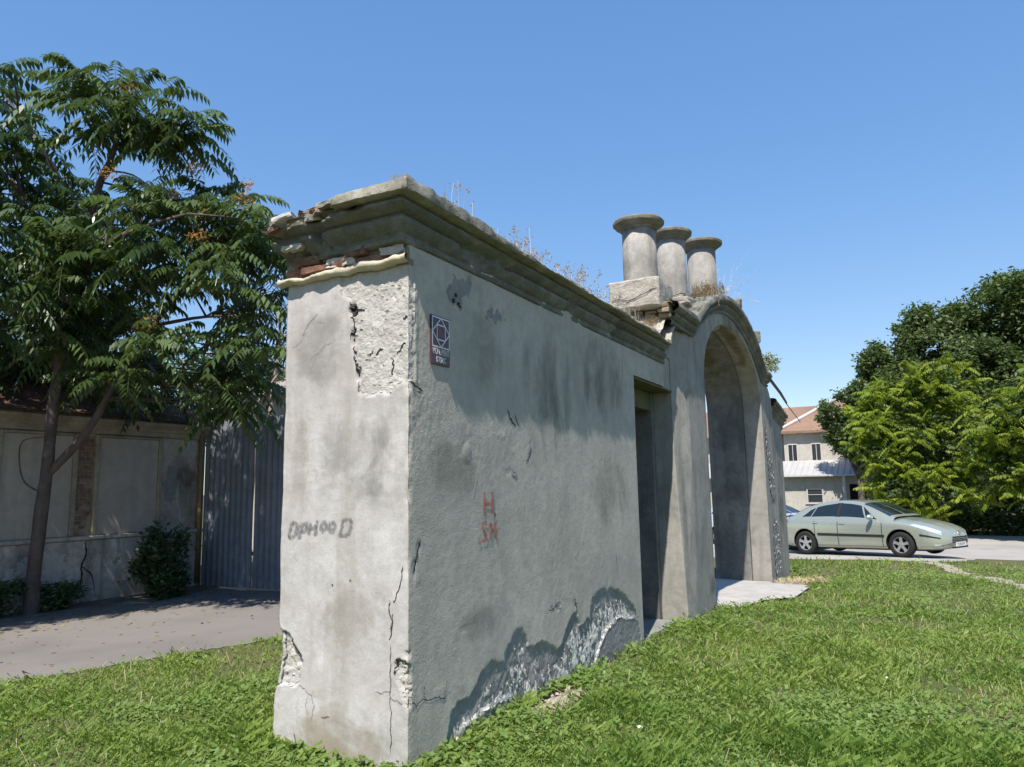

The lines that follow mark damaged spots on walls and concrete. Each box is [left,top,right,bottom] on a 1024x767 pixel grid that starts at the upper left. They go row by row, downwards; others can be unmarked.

spalling [265,198,334,239]
flaking render [285,243,416,395]
peeling [447,273,472,311]
flaking render [630,302,674,325]
flaking render [277,631,303,686]
flaking render [394,658,412,709]
crack [376,541,448,753]